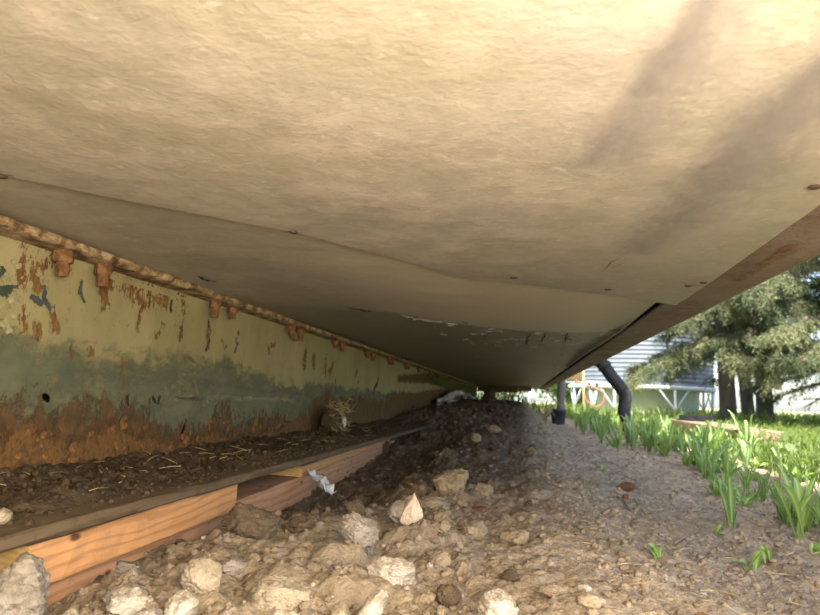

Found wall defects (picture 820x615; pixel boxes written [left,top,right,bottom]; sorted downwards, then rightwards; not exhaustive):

peeling [0,259,54,334]
corrosion [16,241,54,296]
corrosion [18,304,60,341]
peeling [65,280,86,310]
corrosion [99,271,169,333]
corrosion [0,357,463,470]